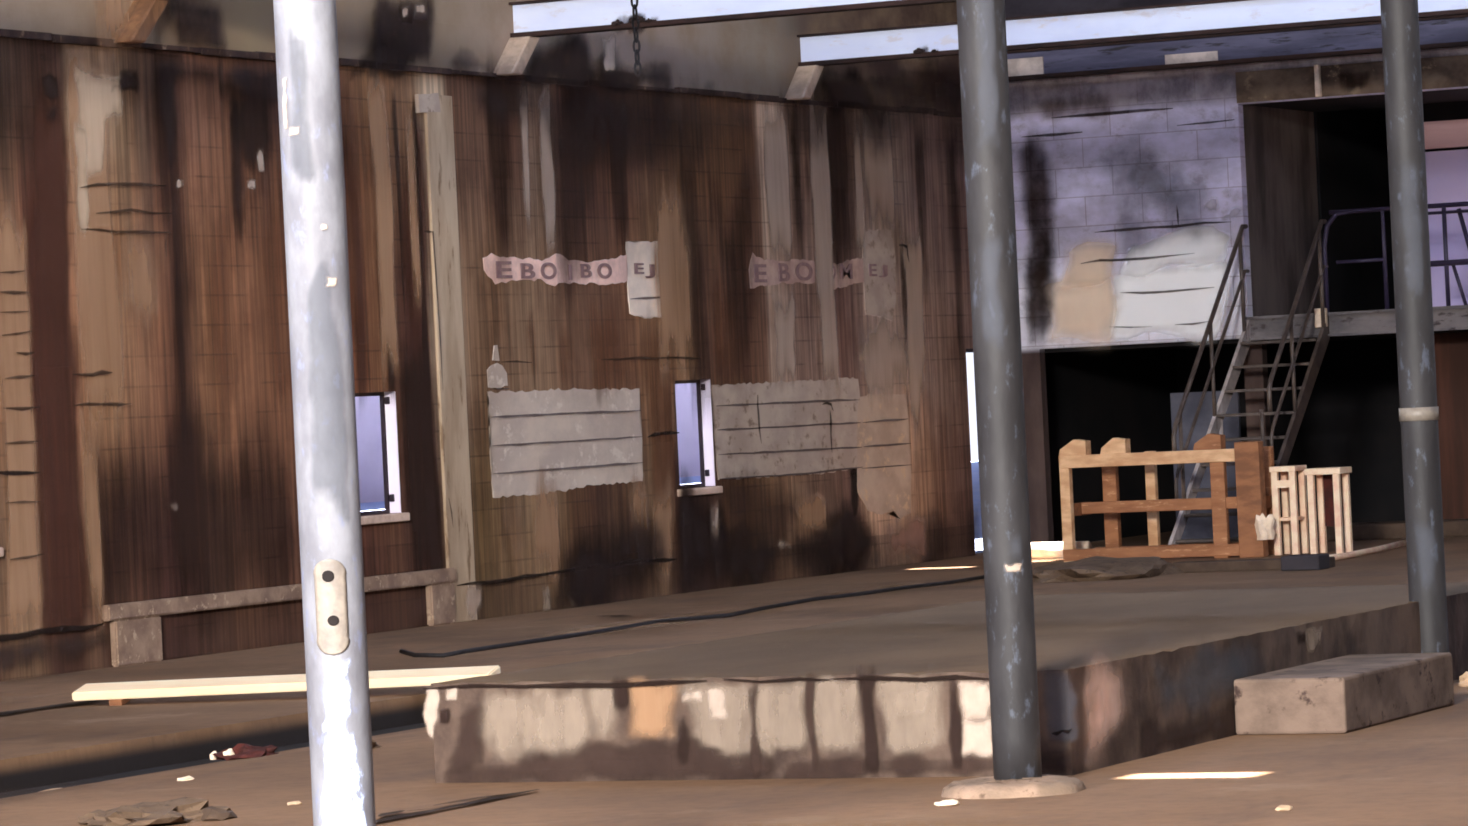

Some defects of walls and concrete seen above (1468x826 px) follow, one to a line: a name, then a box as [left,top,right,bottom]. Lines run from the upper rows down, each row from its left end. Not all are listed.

water stain [1027,259,1051,334]
peeling [1067,228,1227,284]
water stain [633,487,672,578]
peeling [321,659,367,826]